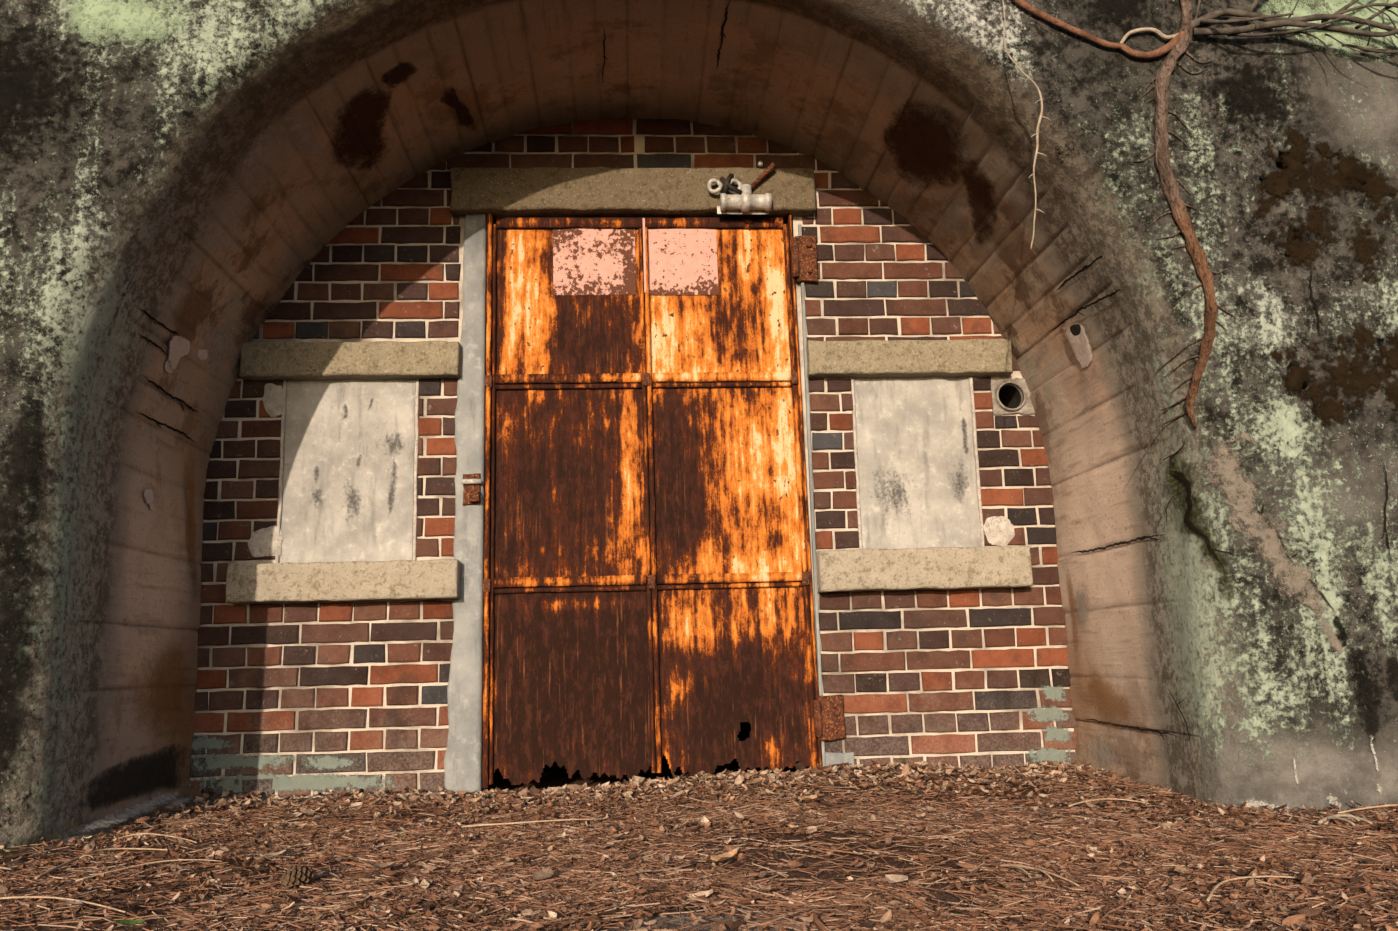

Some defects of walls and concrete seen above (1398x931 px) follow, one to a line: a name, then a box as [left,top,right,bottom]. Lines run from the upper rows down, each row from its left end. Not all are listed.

crack [716,0,730,69]
water stain [230,63,416,192]
water stain [441,88,474,130]
water stain [883,102,997,243]
crack [1047,255,1121,333]
crack [138,308,198,442]
crack [1072,441,1233,573]
water stain [0,395,63,770]
water stain [1333,616,1398,793]
water stain [84,744,191,832]